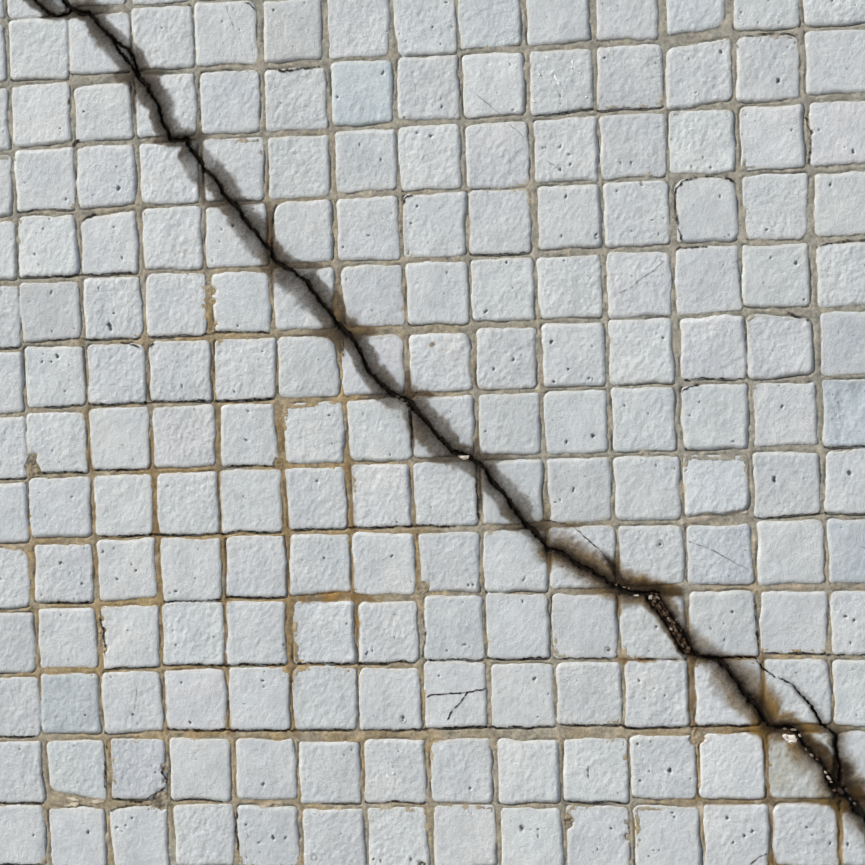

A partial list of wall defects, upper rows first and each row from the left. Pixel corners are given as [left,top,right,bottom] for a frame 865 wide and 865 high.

crack [34,0,113,39]
crack [27,208,96,221]
crack [27,271,132,279]
water stain [24,0,551,540]
crack [48,331,267,348]
crack [44,397,272,408]
crack [112,36,865,821]
crack [42,467,143,475]
crack [104,743,239,850]
water stain [847,798,865,838]